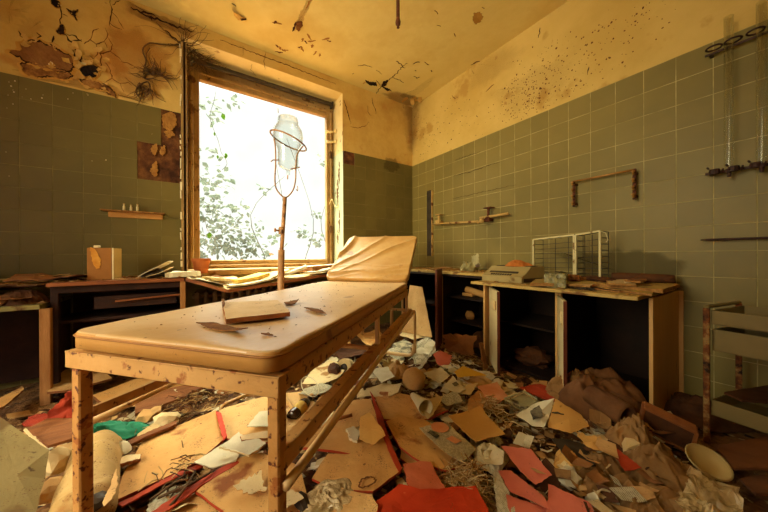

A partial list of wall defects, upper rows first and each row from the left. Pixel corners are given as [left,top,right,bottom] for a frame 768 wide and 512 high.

flaking render [4,24,118,99]
crack [18,0,192,90]
crack [344,61,407,128]
mould [488,2,650,122]
peeling [137,94,182,198]